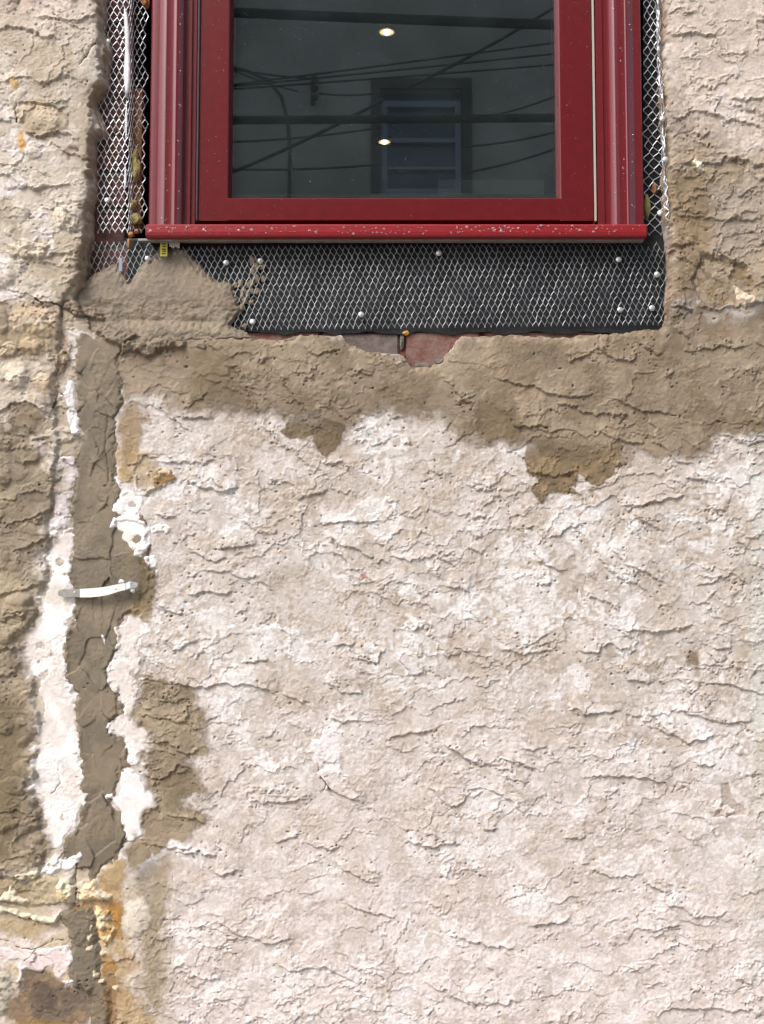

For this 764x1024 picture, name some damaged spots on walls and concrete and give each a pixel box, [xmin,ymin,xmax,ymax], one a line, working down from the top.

spalling [247,330,595,368]
peeling [60,379,80,435]
peeling [110,468,176,578]
peeling [0,455,117,956]
peeling [101,614,157,841]
rust [109,900,123,935]
peeling [0,945,74,993]